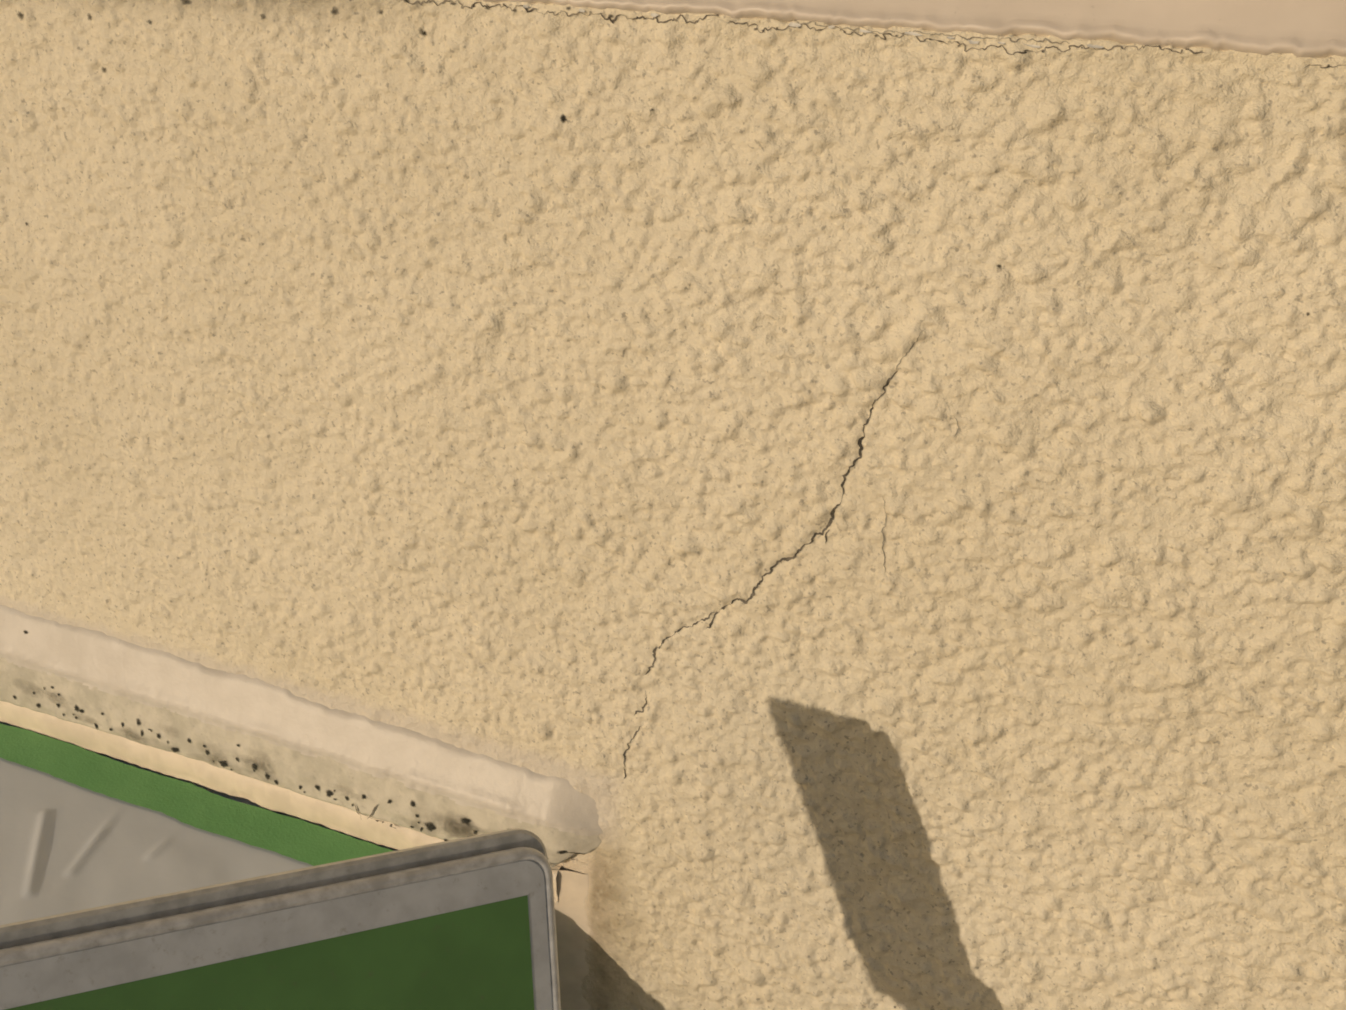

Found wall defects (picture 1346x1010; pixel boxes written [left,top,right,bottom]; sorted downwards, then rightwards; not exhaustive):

leakage [33,686,278,785]
crack [623,330,924,779]